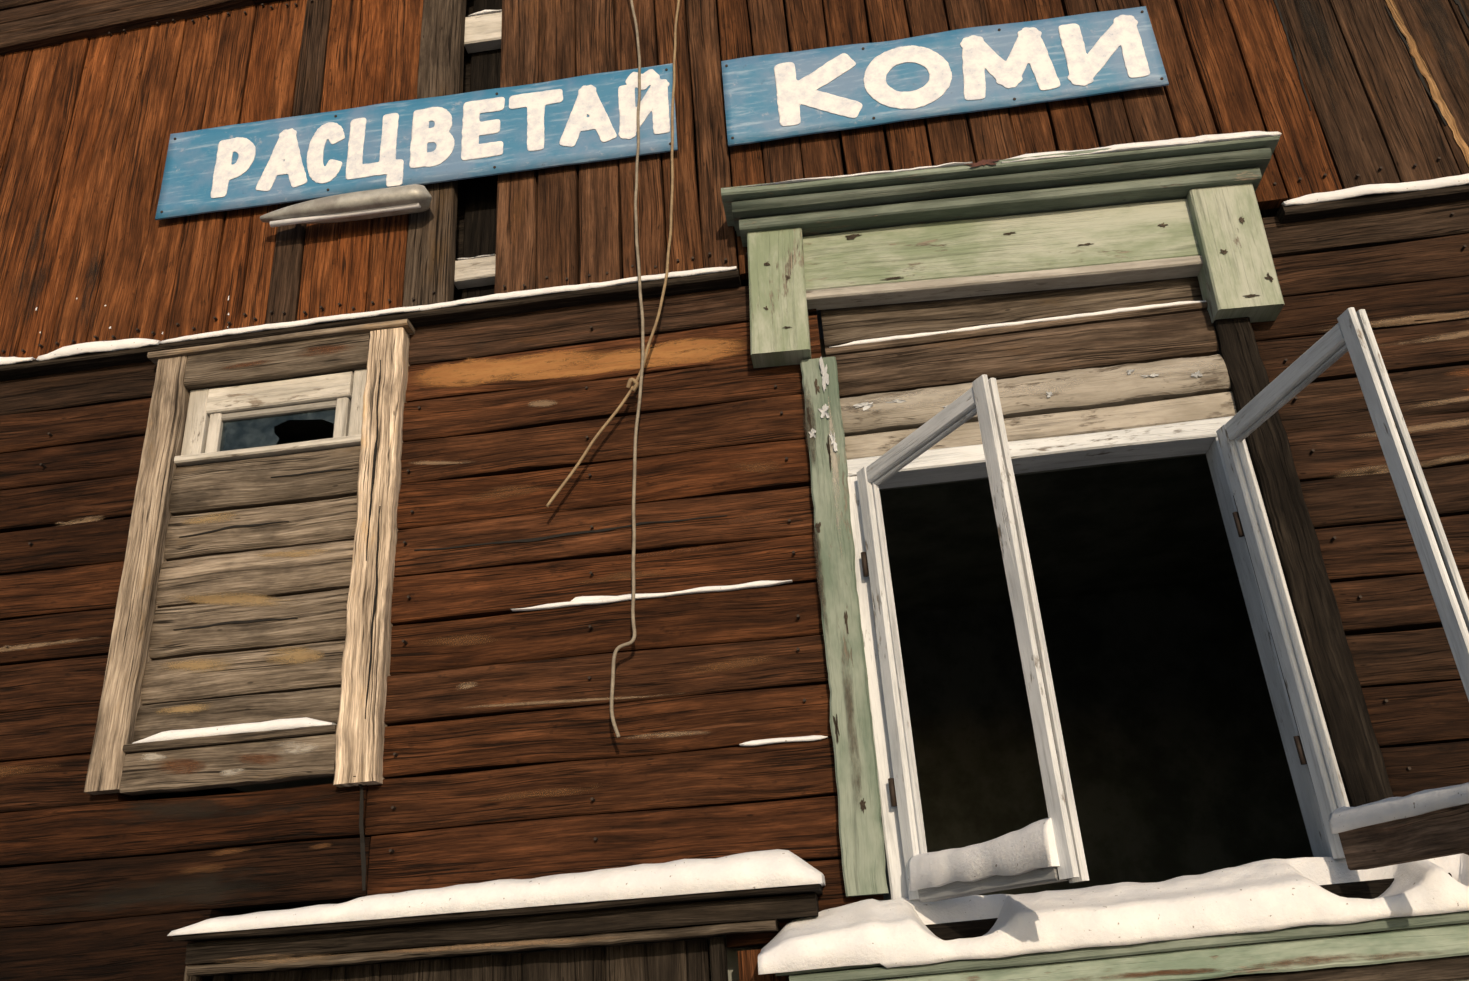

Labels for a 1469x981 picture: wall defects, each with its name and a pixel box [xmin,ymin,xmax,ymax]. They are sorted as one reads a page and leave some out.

crack [1385,0,1469,168]
peeling [805,357,838,482]
peeling [815,519,849,634]
peeling [833,684,857,751]